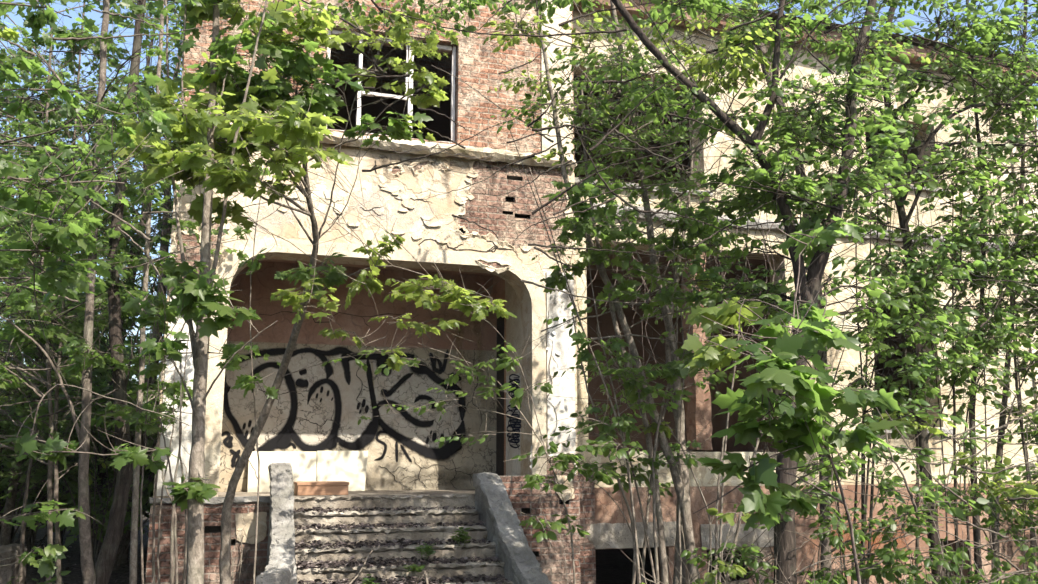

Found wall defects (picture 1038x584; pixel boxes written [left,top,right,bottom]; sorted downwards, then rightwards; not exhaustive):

flaking render [379,157,573,274]